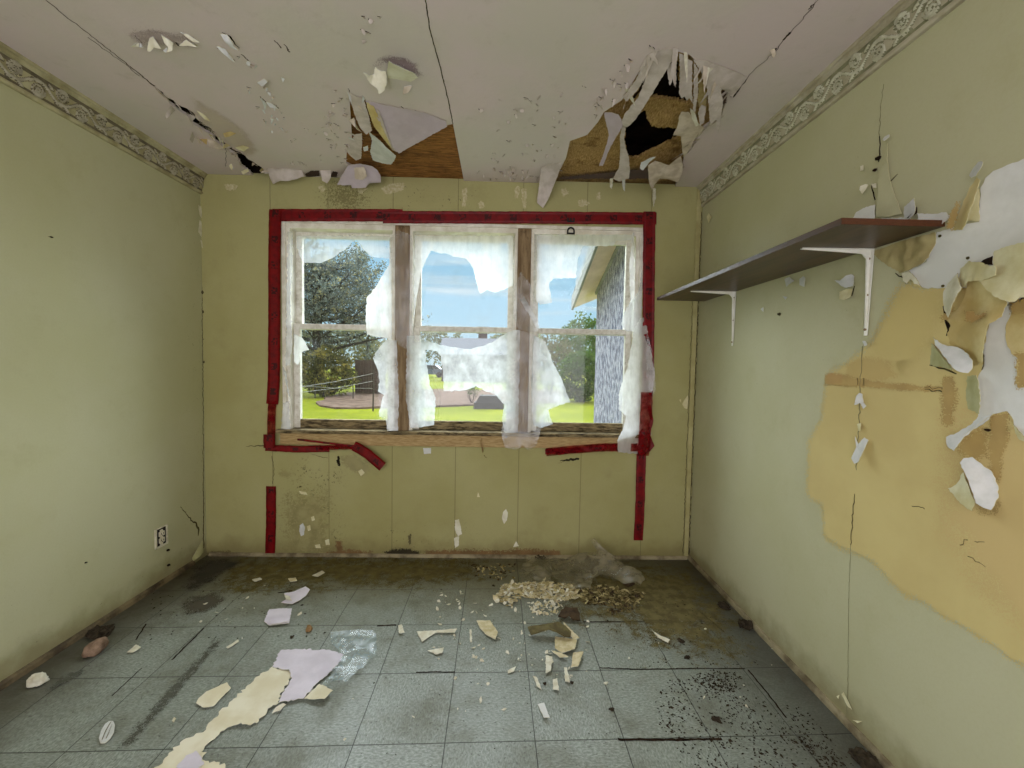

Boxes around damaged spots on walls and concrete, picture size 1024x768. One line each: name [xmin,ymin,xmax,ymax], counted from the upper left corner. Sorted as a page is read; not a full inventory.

crack [46,0,269,174]
peeling [130,29,200,52]
peeling [267,90,360,193]
crack [425,0,453,123]
spalling [624,111,677,156]
spalling [653,61,686,100]
crack [733,0,818,97]
crack [859,84,902,217]
peeling [853,159,1024,289]
peeling [835,274,855,300]
peeling [964,297,1024,437]
crack [848,341,868,649]